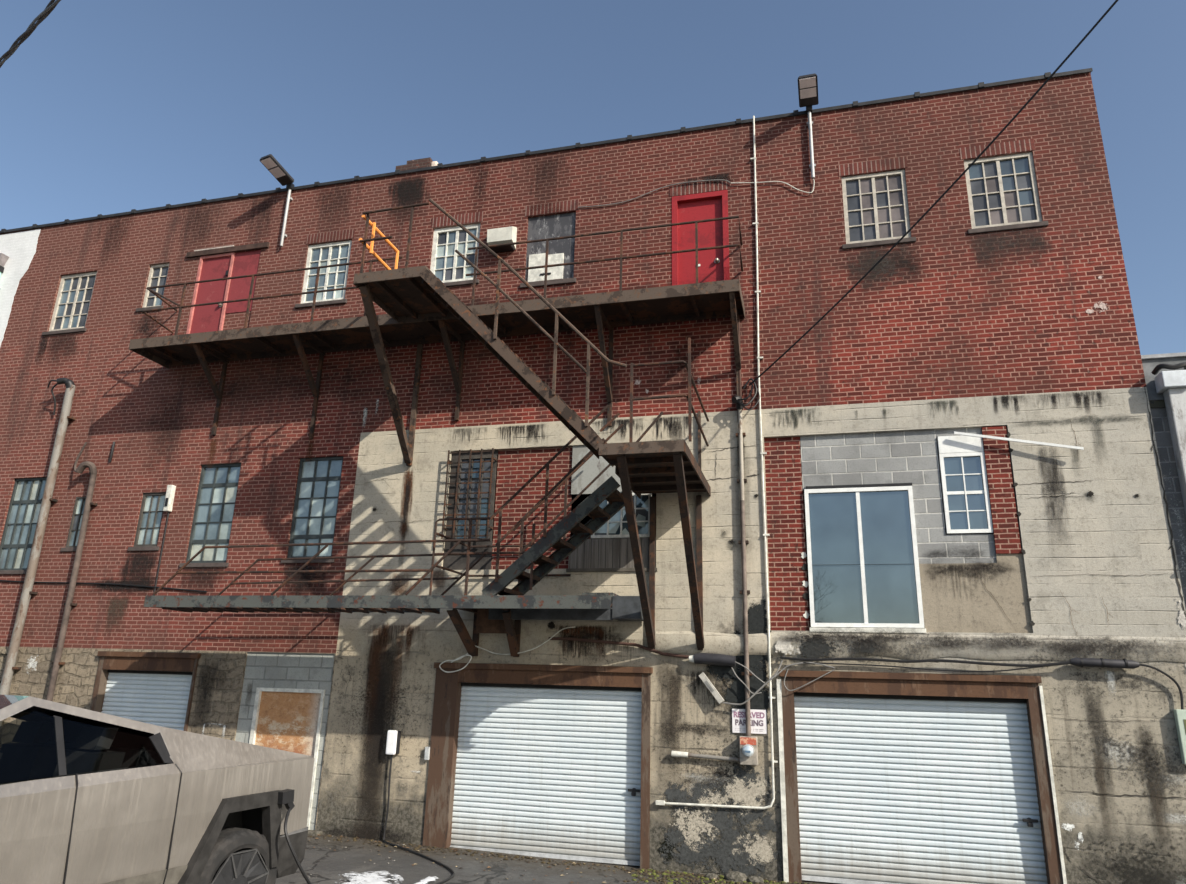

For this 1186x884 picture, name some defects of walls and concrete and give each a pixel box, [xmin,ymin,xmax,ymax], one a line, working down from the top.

damp [389,178,424,207]
damp [994,396,1022,410]
damp [1030,392,1127,424]
damp [933,551,1007,577]
damp [782,627,1186,884]
peeling [659,764,781,877]